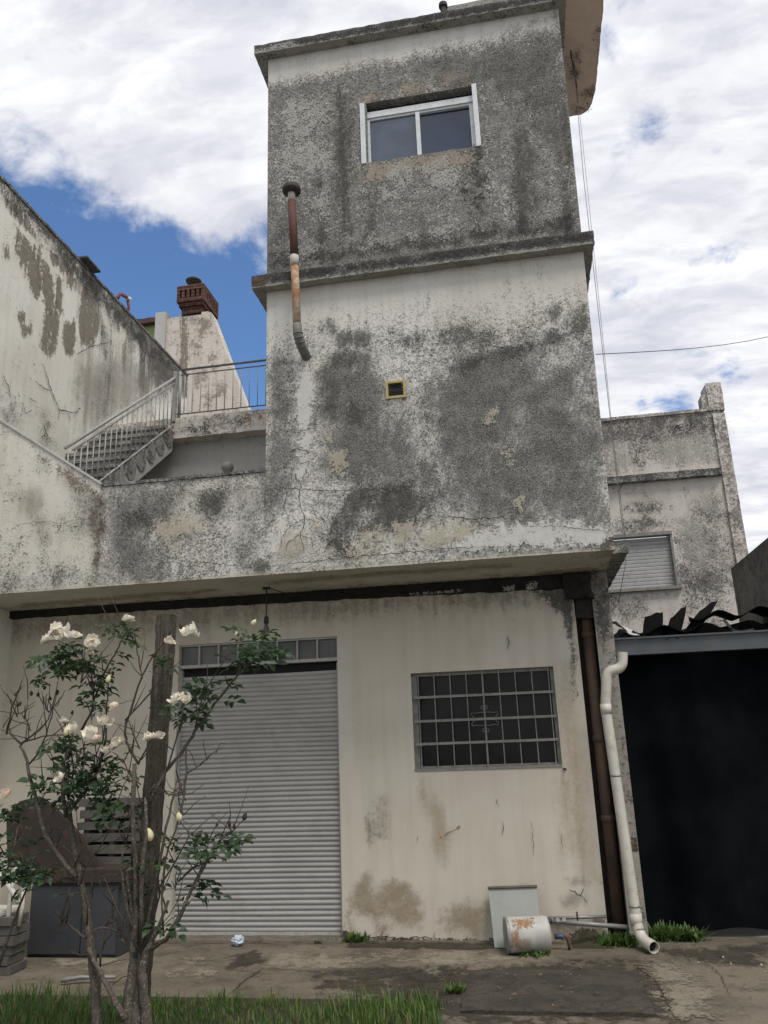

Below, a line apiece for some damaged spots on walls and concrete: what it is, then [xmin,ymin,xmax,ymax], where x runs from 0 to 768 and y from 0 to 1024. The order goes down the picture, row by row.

leakage [267,0,594,282]
peeling [3,193,138,358]
crack [3,367,81,442]
leakage [0,301,719,590]
crack [188,427,604,568]
leakage [53,957,120,970]
leakage [165,875,768,1024]